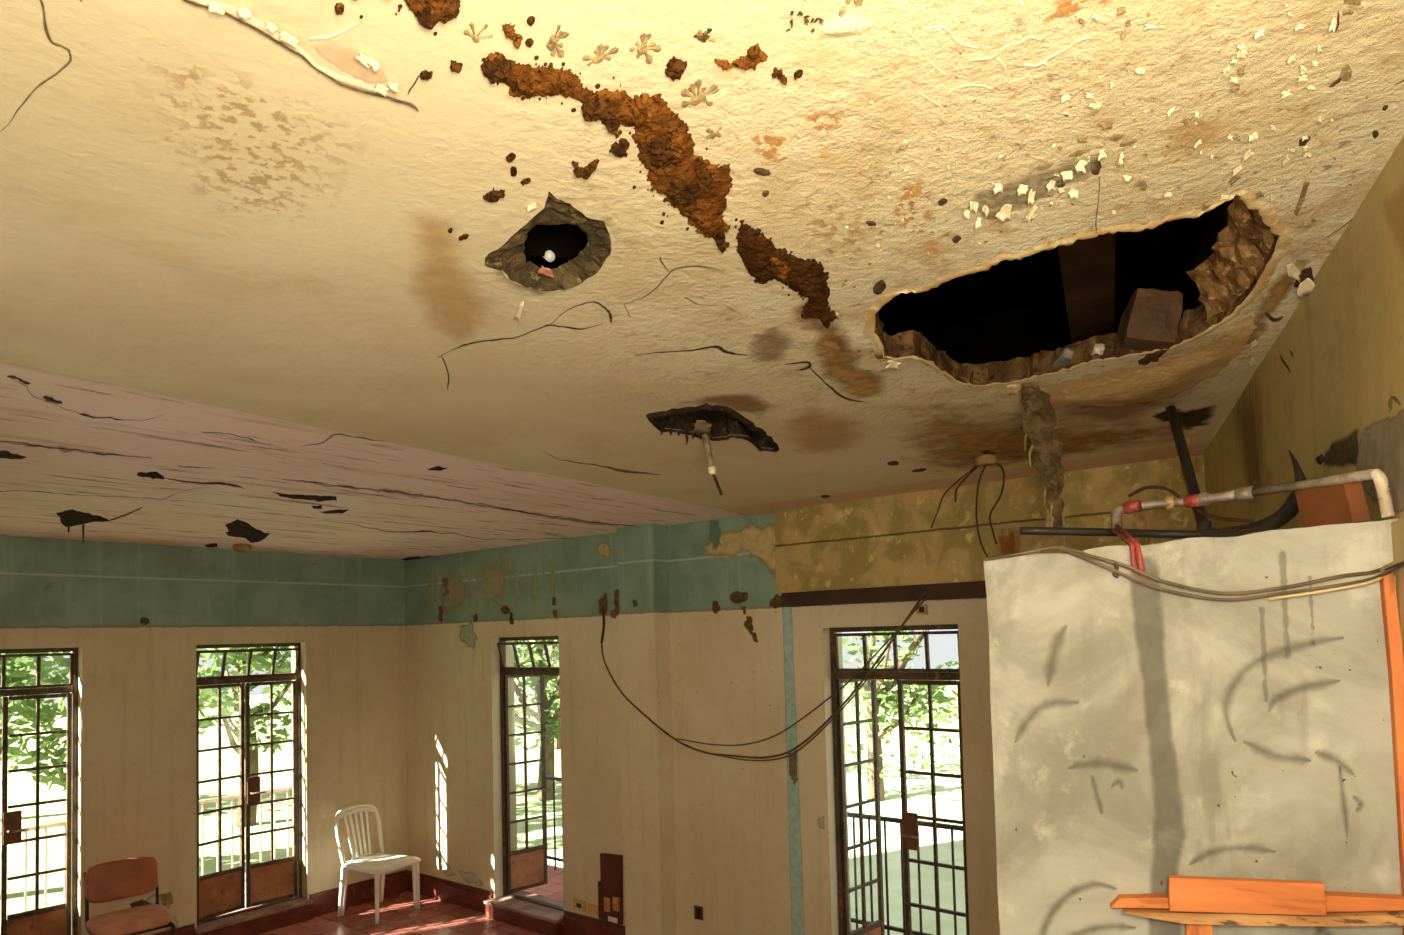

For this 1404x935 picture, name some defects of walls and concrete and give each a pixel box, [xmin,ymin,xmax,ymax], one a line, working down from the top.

rust [335,0,363,19]
rust [395,0,461,36]
crack [0,0,72,132]
rust [450,60,463,73]
rust [480,16,844,346]
peeling [952,134,1137,243]
spalling [1186,198,1276,320]
crack [437,257,723,390]
crack [7,375,161,421]
damp [887,421,1033,472]
damp [1057,406,1212,454]
peeling [703,520,776,574]